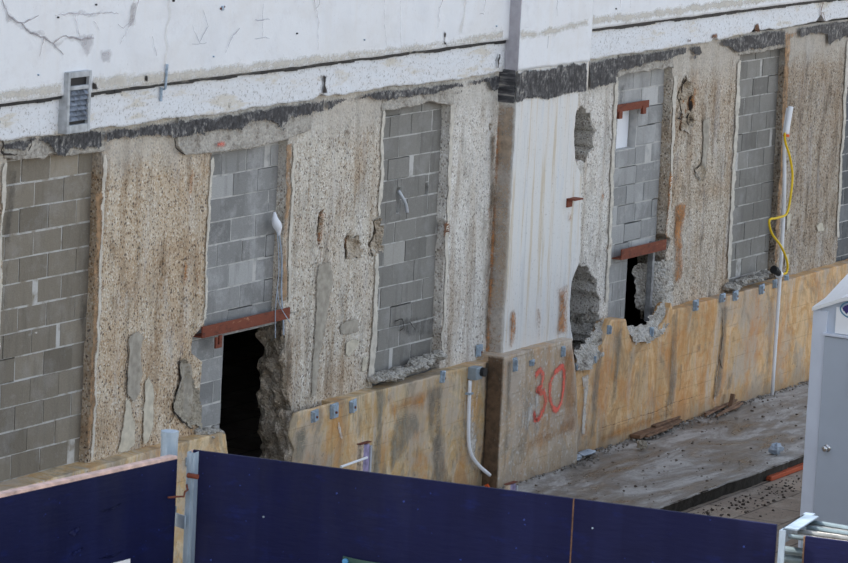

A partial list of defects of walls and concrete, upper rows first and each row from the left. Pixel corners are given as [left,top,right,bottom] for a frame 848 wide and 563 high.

crack [2,0,139,55]
peeling [4,76,463,157]
peeling [473,39,702,103]
spalling [677,78,696,134]
corrosion [666,174,685,282]
corrosion [559,291,567,332]
spalling [570,279,605,373]
spalling [255,320,295,462]